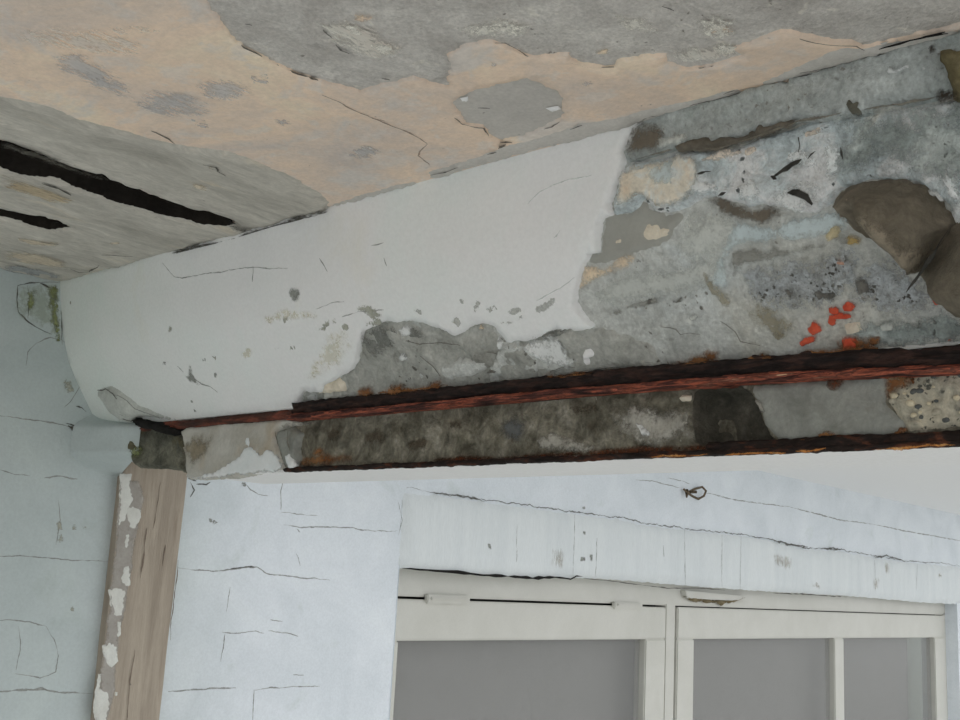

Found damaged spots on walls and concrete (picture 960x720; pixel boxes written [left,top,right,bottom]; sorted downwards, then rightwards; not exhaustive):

spalling [207,0,960,402]
rust [434,446,707,461]
rust [667,351,717,367]
spalling [679,386,775,449]
rust [724,431,835,456]
rust [827,379,843,390]
spalling [887,375,960,431]
flaking render [93,417,307,720]
crack [189,558,327,657]
crack [248,484,955,590]
crack [776,591,841,599]
crack [0,619,90,694]